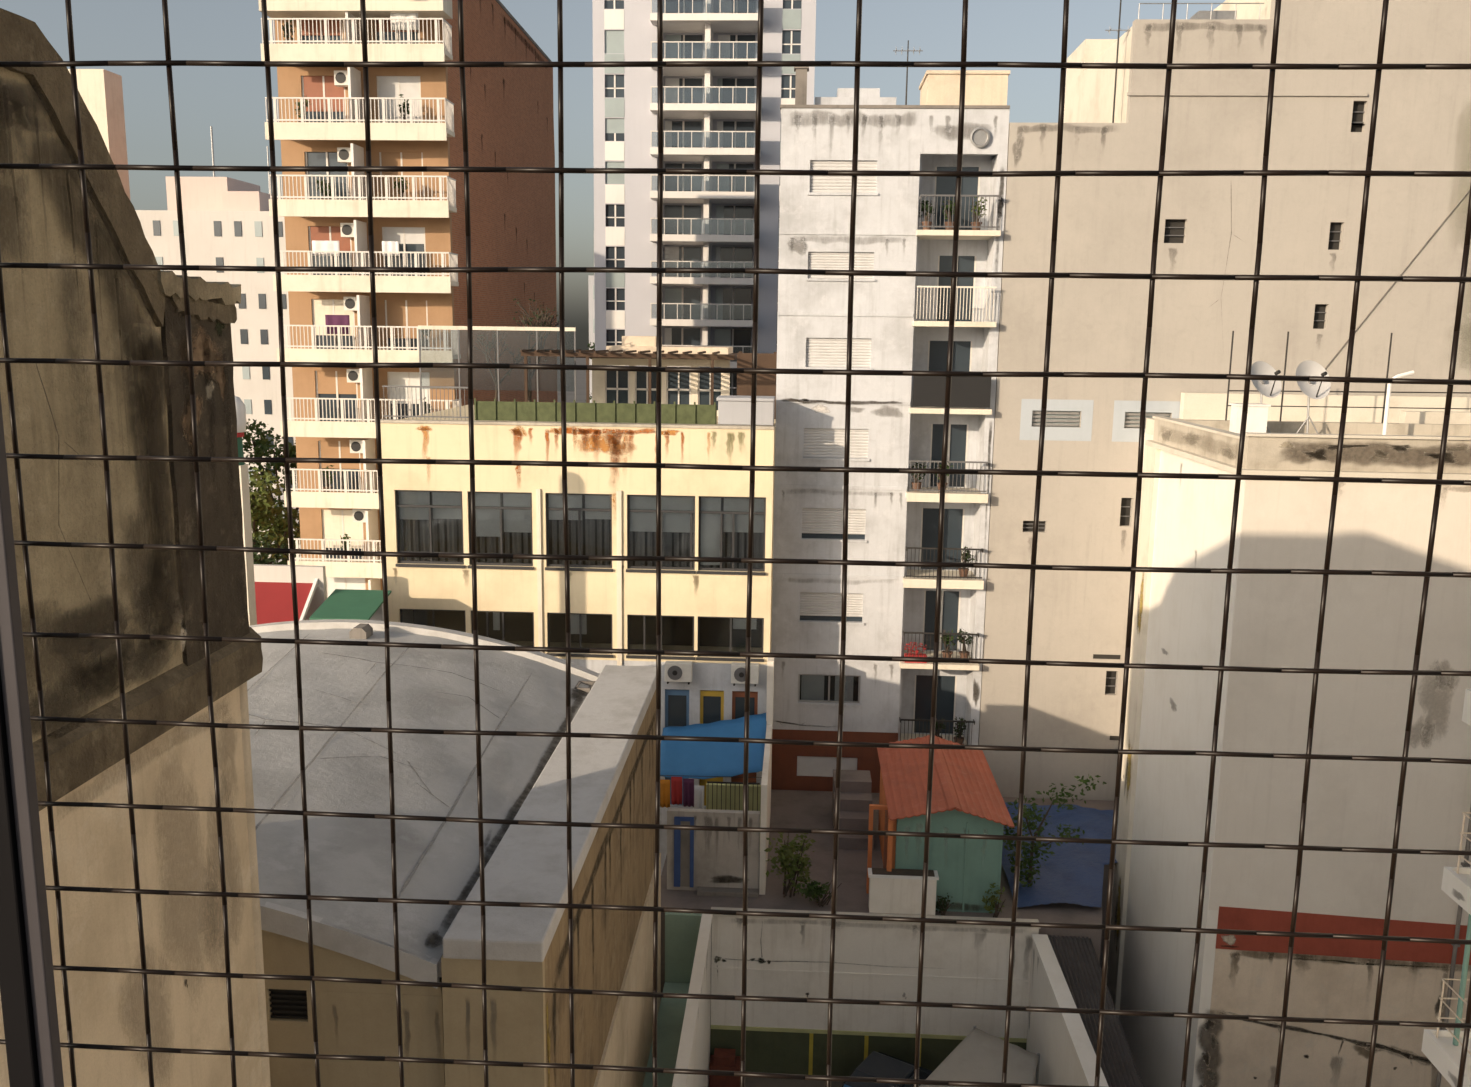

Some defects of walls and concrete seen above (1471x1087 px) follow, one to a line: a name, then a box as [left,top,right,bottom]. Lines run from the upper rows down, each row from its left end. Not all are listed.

damp [0,80,50,163]
damp [29,148,174,736]
rust [511,427,684,462]